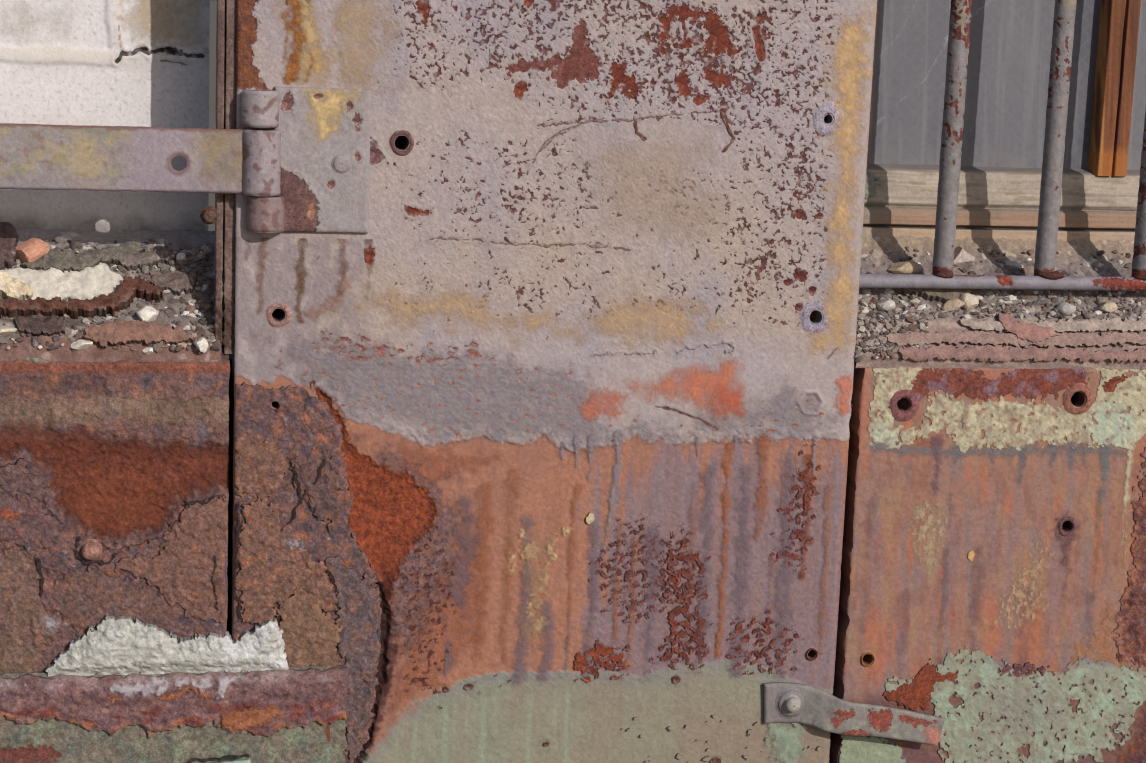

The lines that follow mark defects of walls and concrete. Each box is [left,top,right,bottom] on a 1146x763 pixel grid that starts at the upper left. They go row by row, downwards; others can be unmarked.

crack [115,25,205,65]
corrosion [505,18,648,113]
corrosion [656,0,766,106]
corrosion [404,205,432,217]
corrosion [906,367,1093,402]
peeling [867,367,1146,455]
corrosion [1103,374,1128,392]
corrosion [0,380,499,763]
corrosion [495,434,833,688]
peeling [885,676,914,692]
peeling [925,645,1146,763]
peeling [839,735,906,763]